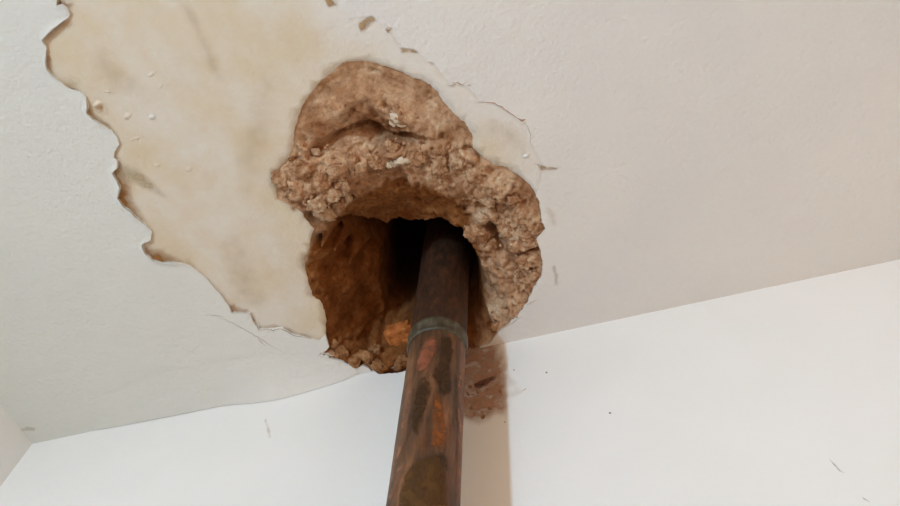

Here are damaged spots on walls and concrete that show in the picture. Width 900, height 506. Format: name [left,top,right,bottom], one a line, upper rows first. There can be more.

crack [448,80,466,88]
crack [479,101,531,141]
peeling [38,0,556,374]